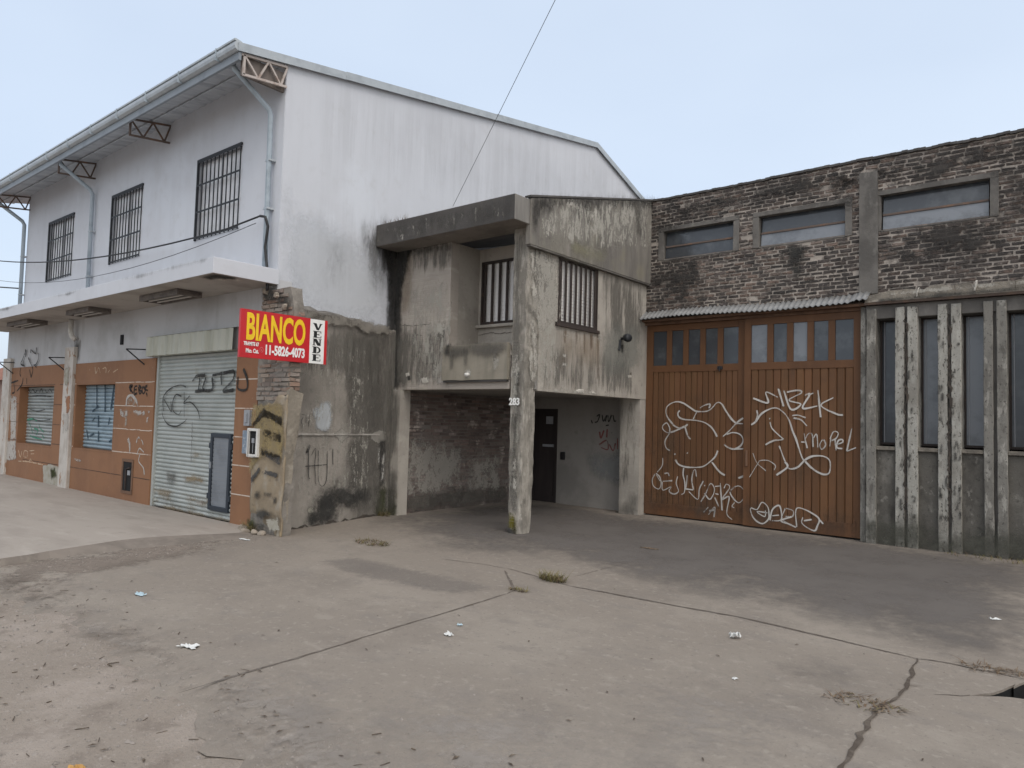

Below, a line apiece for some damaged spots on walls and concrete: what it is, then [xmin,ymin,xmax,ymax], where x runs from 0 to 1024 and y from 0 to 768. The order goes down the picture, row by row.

leakage [631,173,859,233]
leakage [877,139,1024,214]
leakage [899,221,1002,263]
flaking render [256,360,301,400]
leakage [309,237,1018,646]
flaking render [255,493,280,531]
crack [179,558,1024,768]